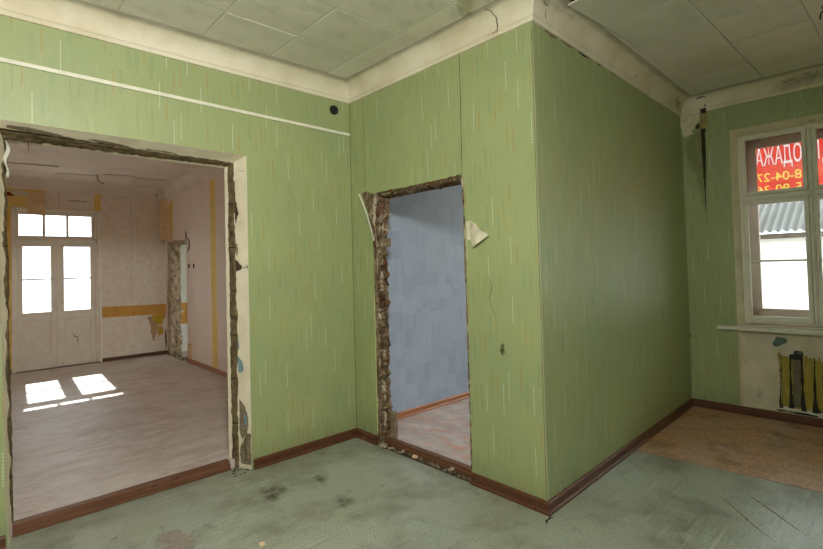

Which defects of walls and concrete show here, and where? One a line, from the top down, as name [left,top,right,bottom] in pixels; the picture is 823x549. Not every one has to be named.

flaking render [0,125,251,522]
spalling [776,407,823,417]